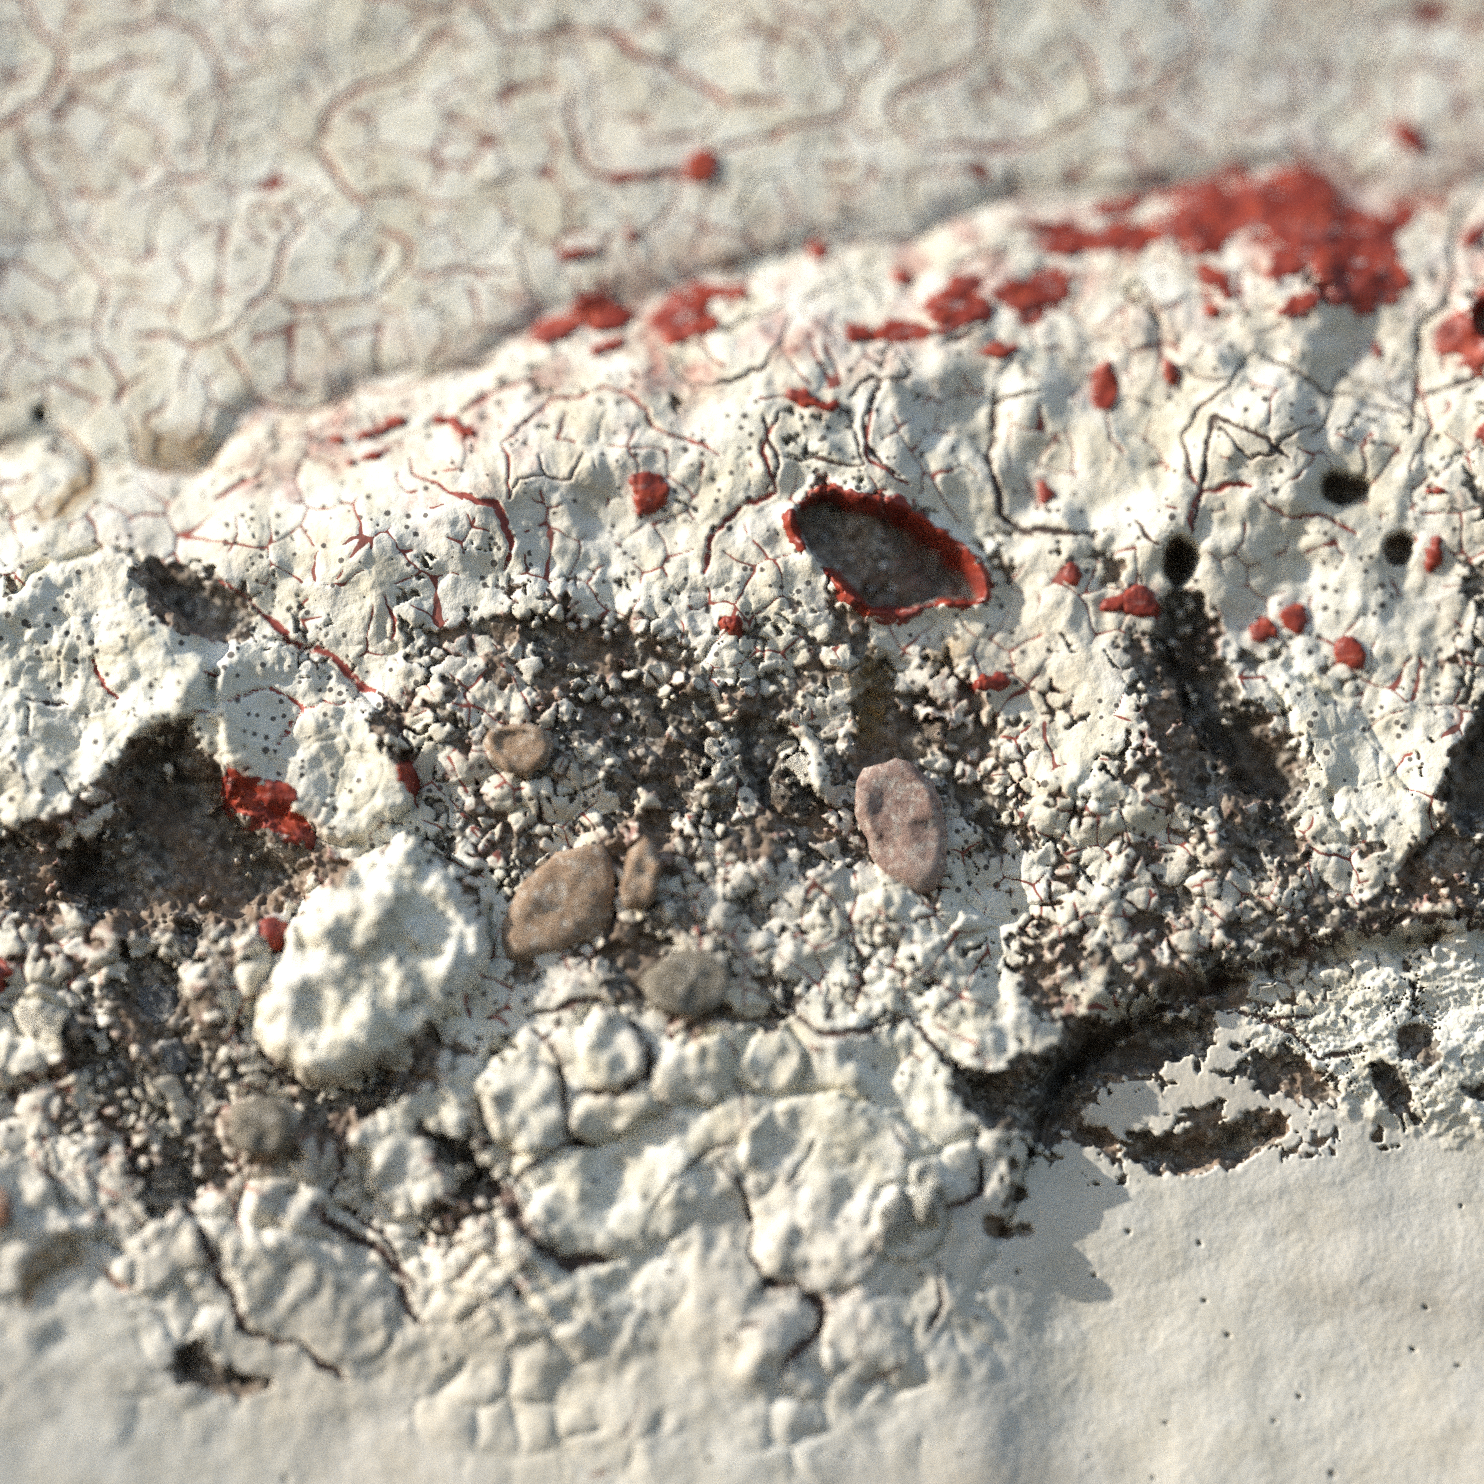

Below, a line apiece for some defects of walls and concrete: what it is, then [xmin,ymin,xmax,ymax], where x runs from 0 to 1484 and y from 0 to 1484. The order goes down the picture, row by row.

peeling [870,159,1427,348]
spalling [503,596,850,875]
spalling [841,647,1035,859]
spalling [1115,587,1313,877]
spalling [1398,694,1484,921]
spalling [0,719,317,1221]
crack [178,938,427,1327]
crack [429,897,904,1385]
crack [945,1159,986,1210]
spalling [952,1007,1342,1178]
crack [927,1267,945,1333]
crack [589,1400,642,1478]